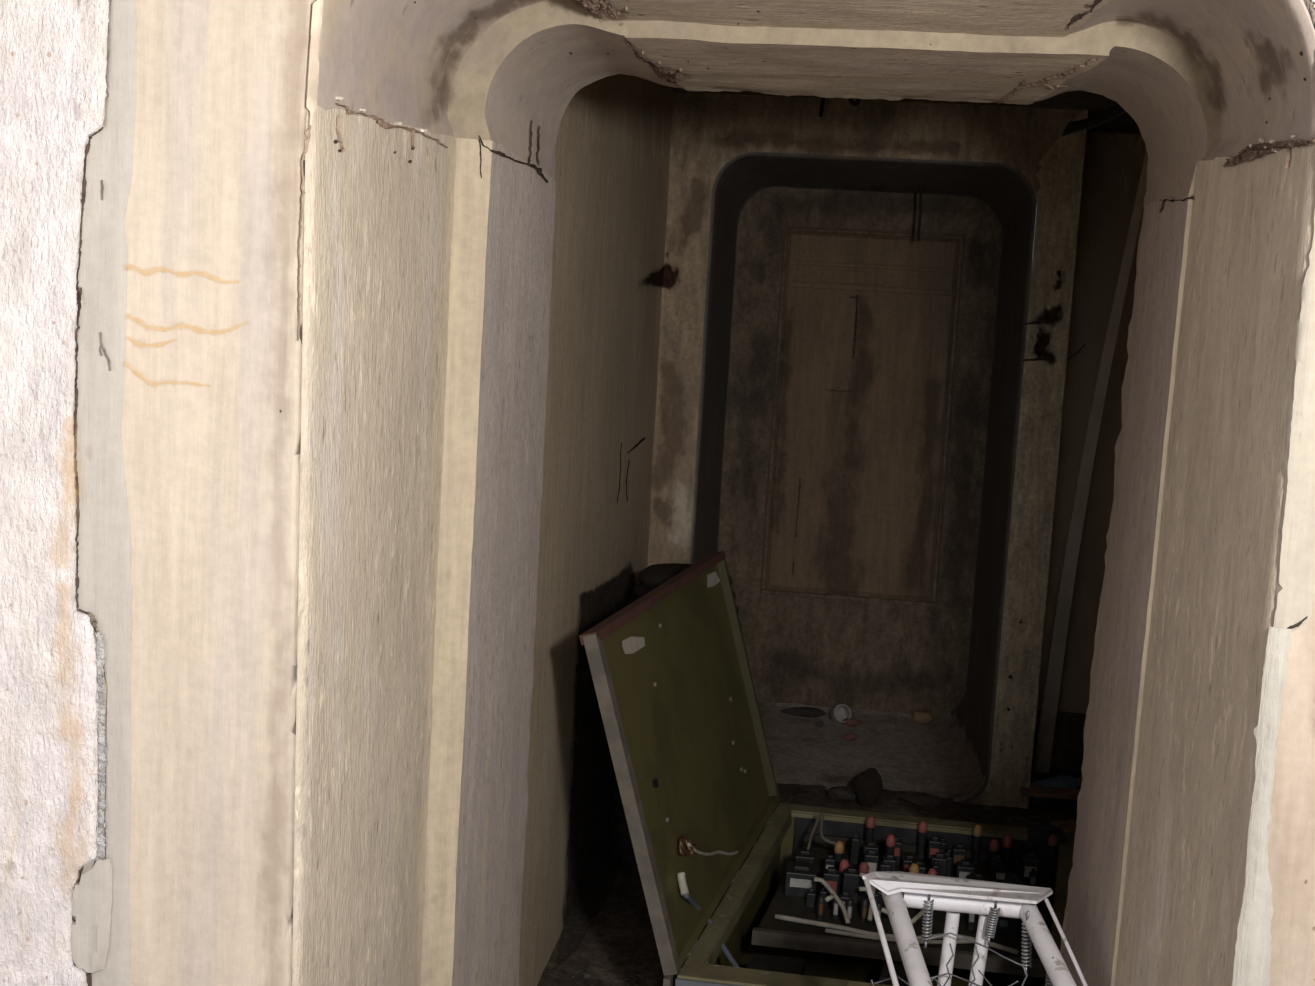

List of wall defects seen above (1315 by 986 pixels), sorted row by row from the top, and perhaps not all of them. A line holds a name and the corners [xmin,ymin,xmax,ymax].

crack [1068,0,1102,29]
crack [298,96,448,341]
crack [478,120,549,183]
damp [654,365,690,547]
spalling [88,611,107,860]